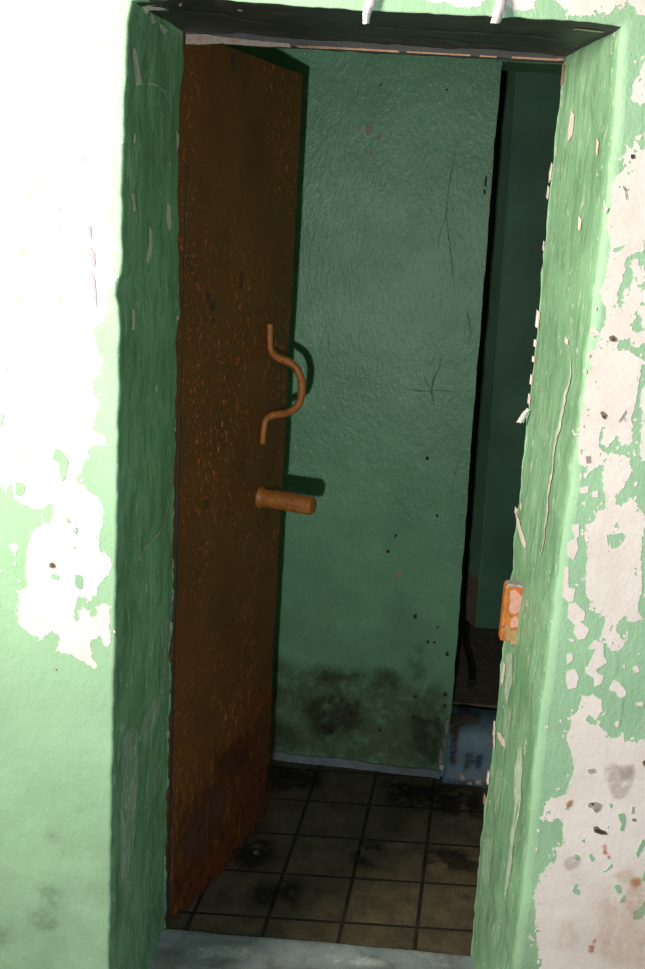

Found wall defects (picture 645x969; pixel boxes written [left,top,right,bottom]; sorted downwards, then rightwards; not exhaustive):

peeling [143,5,168,34]
peeling [362,0,377,24]
peeling [426,0,537,24]
peeling [556,0,645,19]
peeling [186,34,497,72]
peeling [512,56,564,86]
peeling [631,56,645,106]
peeling [0,0,136,669]
peeling [516,311,540,423]
peeling [515,502,526,549]
peeling [529,133,645,969]
peeling [505,588,522,641]